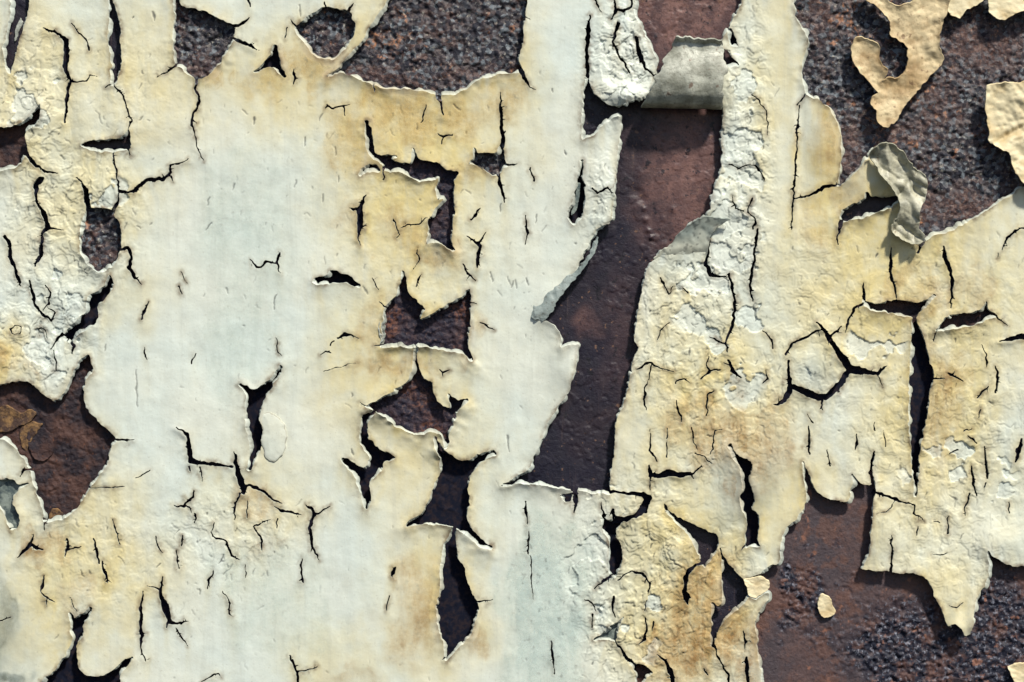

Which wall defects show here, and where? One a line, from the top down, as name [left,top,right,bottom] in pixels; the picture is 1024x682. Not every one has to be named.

crack [44,23,97,123]
peeling [158,0,535,258]
peeling [789,0,1024,254]
crack [3,177,69,371]
peeling [0,177,142,537]
crack [139,427,330,661]
peeling [334,265,502,667]
peeling [496,0,747,589]
crack [584,570,675,682]
crack [604,164,886,523]
peeling [660,437,1024,682]
crack [871,333,1024,555]